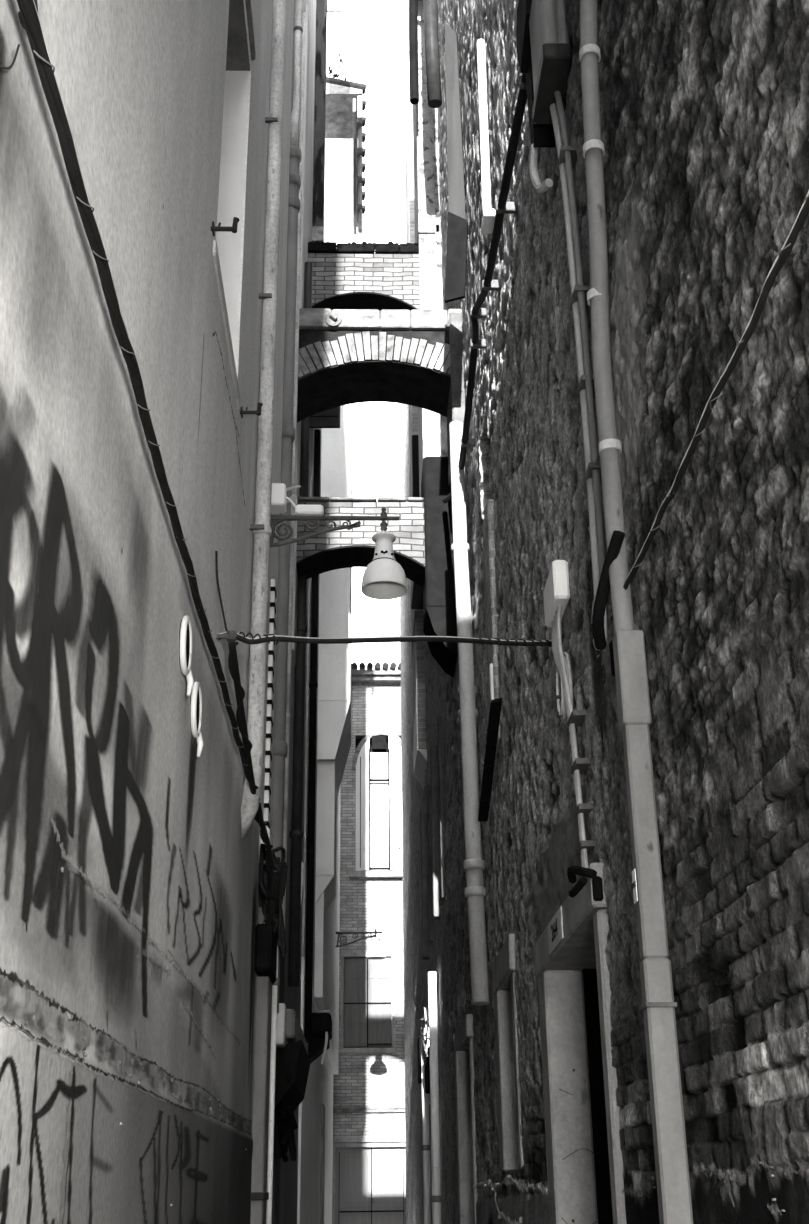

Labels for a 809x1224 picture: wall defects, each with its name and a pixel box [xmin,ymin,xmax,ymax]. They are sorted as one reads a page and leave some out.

crack [0,968,253,1135]